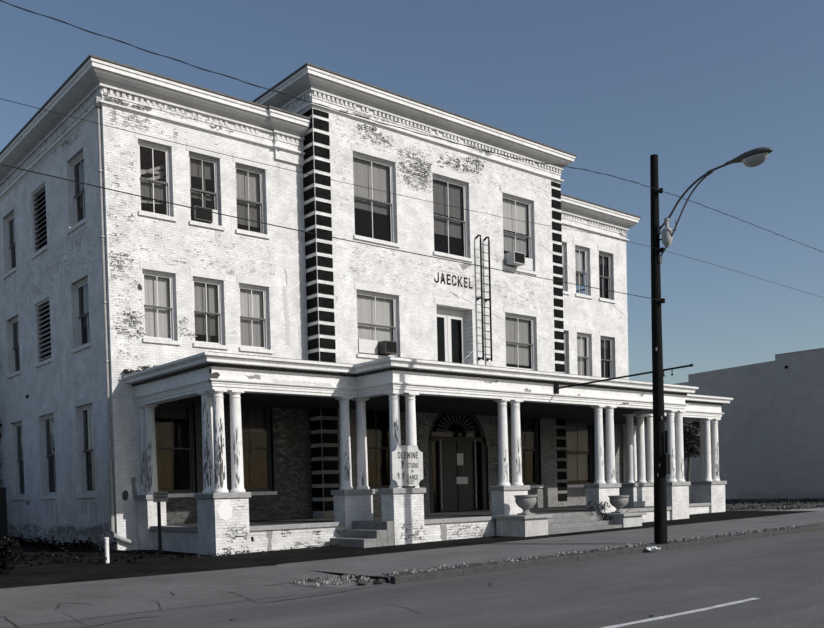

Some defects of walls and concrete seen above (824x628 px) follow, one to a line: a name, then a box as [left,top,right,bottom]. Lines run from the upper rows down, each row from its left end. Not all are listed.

peeling [103,87,234,145]
spalling [107,138,276,360]
peeling [196,402,240,491]